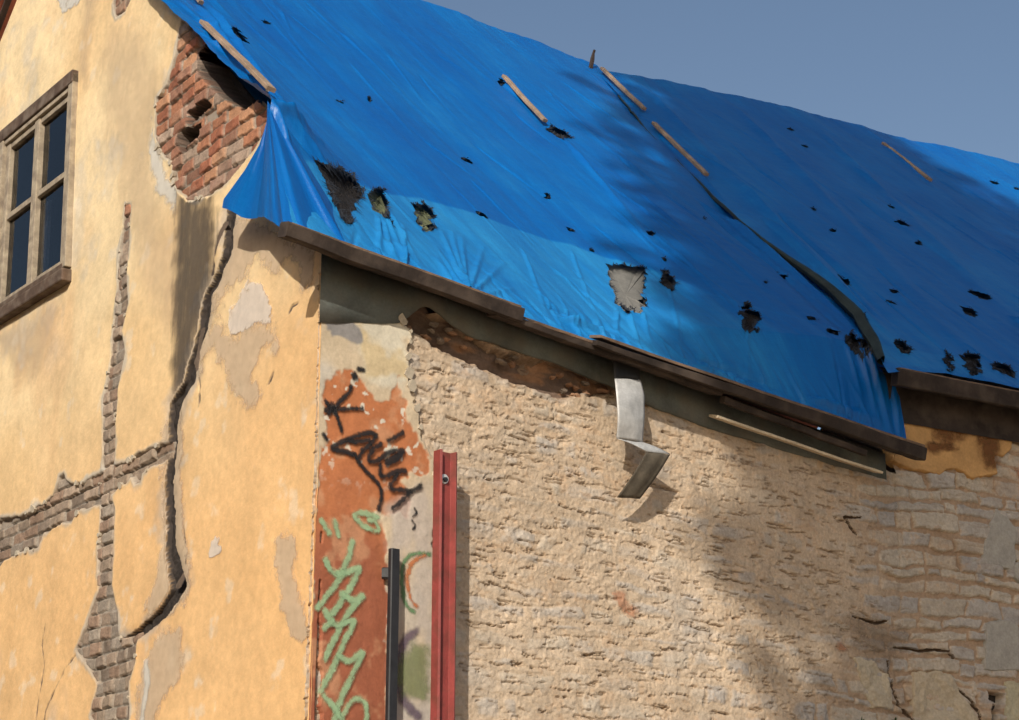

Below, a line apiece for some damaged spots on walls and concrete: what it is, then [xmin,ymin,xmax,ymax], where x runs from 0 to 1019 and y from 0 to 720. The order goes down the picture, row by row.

spalling [153,23,269,201]
flaking render [199,217,315,408]
spalling [0,202,183,720]
crack [141,212,236,635]
flaking render [274,307,610,720]
spalling [882,423,1012,480]
crack [140,659,150,720]
crack [852,615,887,625]
crack [886,646,954,720]
crack [958,688,981,720]